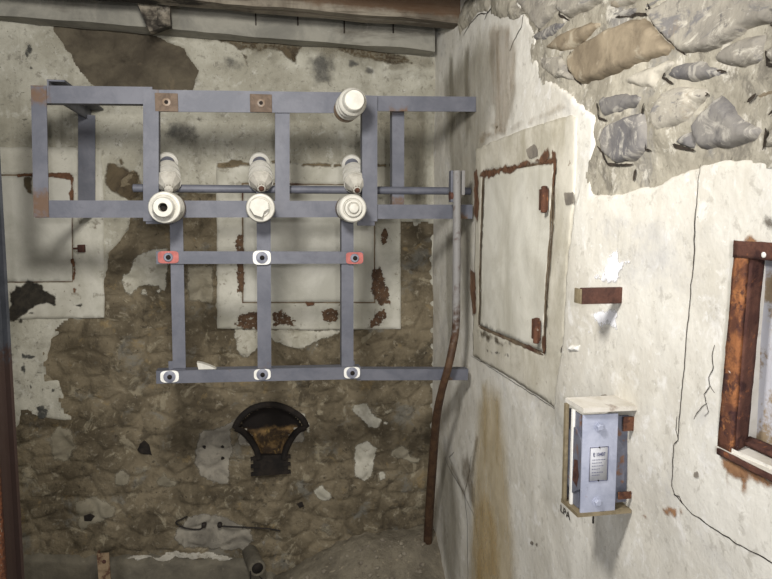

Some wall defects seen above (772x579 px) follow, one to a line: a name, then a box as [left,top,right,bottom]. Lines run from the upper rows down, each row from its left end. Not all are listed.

flaking render [53,26,199,90]
flaking render [458,0,772,196]
flaking render [120,168,143,201]
flaking render [177,193,216,201]
rust [473,149,556,222]
rust [236,264,245,293]
rust [234,311,257,330]
rust [272,309,296,327]
rust [322,308,338,322]
rust [370,267,390,328]
crack [671,165,772,563]
flaking render [16,217,433,575]